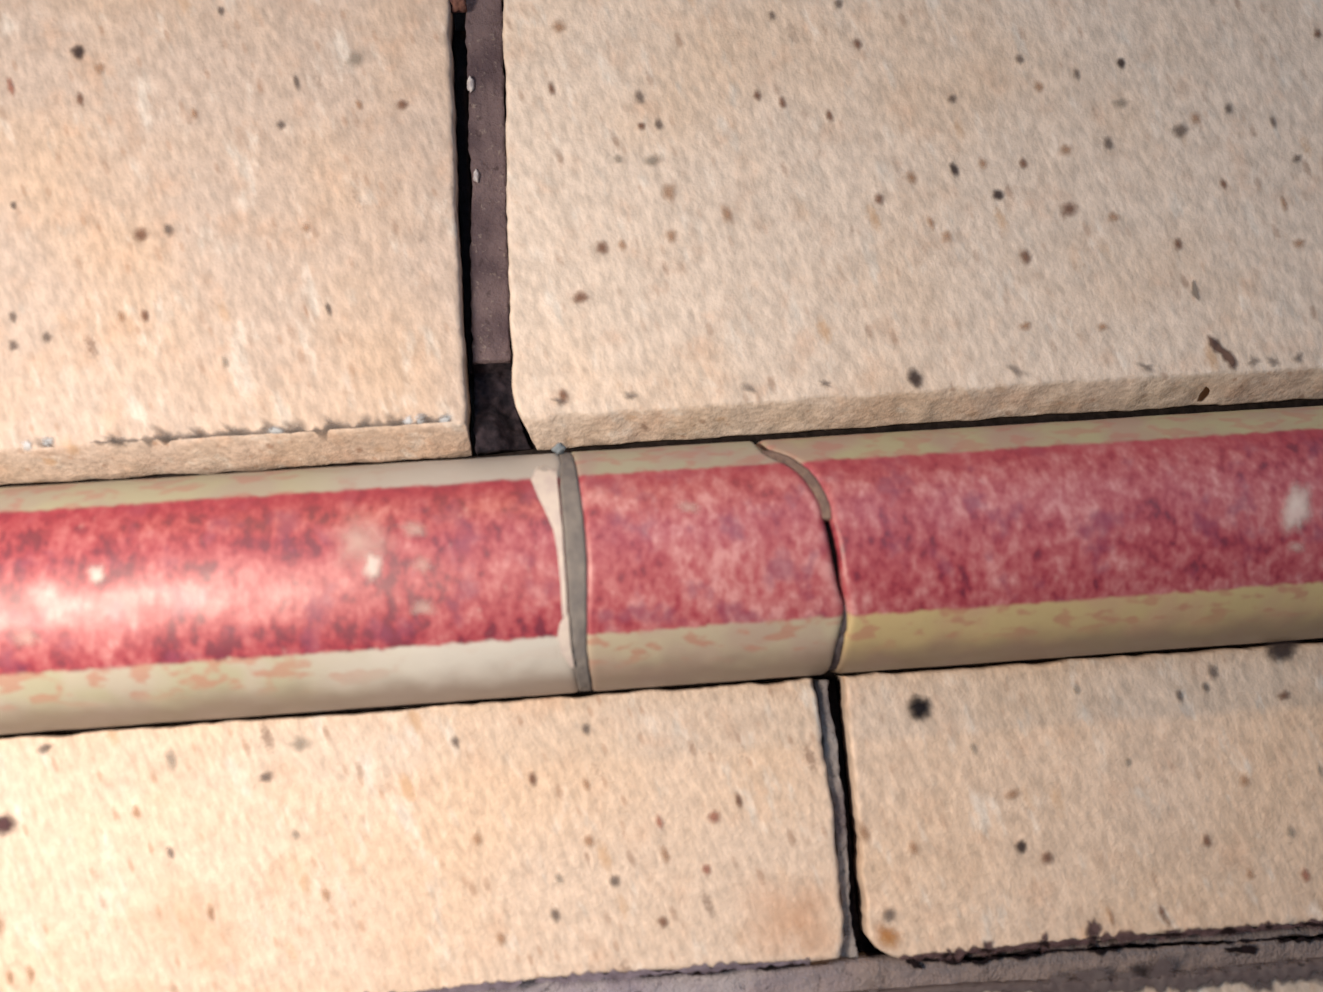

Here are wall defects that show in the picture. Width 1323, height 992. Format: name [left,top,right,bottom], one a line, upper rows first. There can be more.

peeling [531,467,574,668]
crack [761,450,862,943]
crack [639,962,828,977]